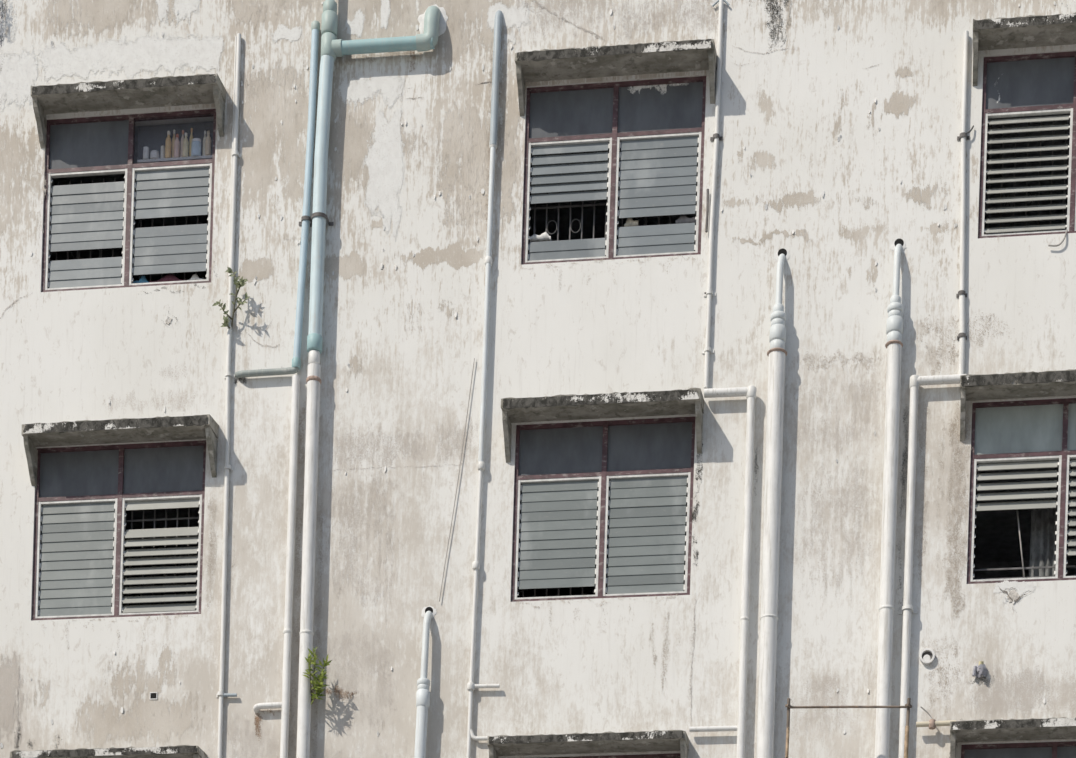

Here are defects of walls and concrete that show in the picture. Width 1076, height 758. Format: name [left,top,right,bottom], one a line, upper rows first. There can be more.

leakage [0,0,216,115]
peeling [338,0,731,71]
crack [524,0,606,41]
leakage [749,0,792,54]
leakage [974,6,1076,29]
peeling [328,112,373,191]
peeling [380,91,523,272]
peeling [324,250,366,283]
flaking render [998,586,1032,604]